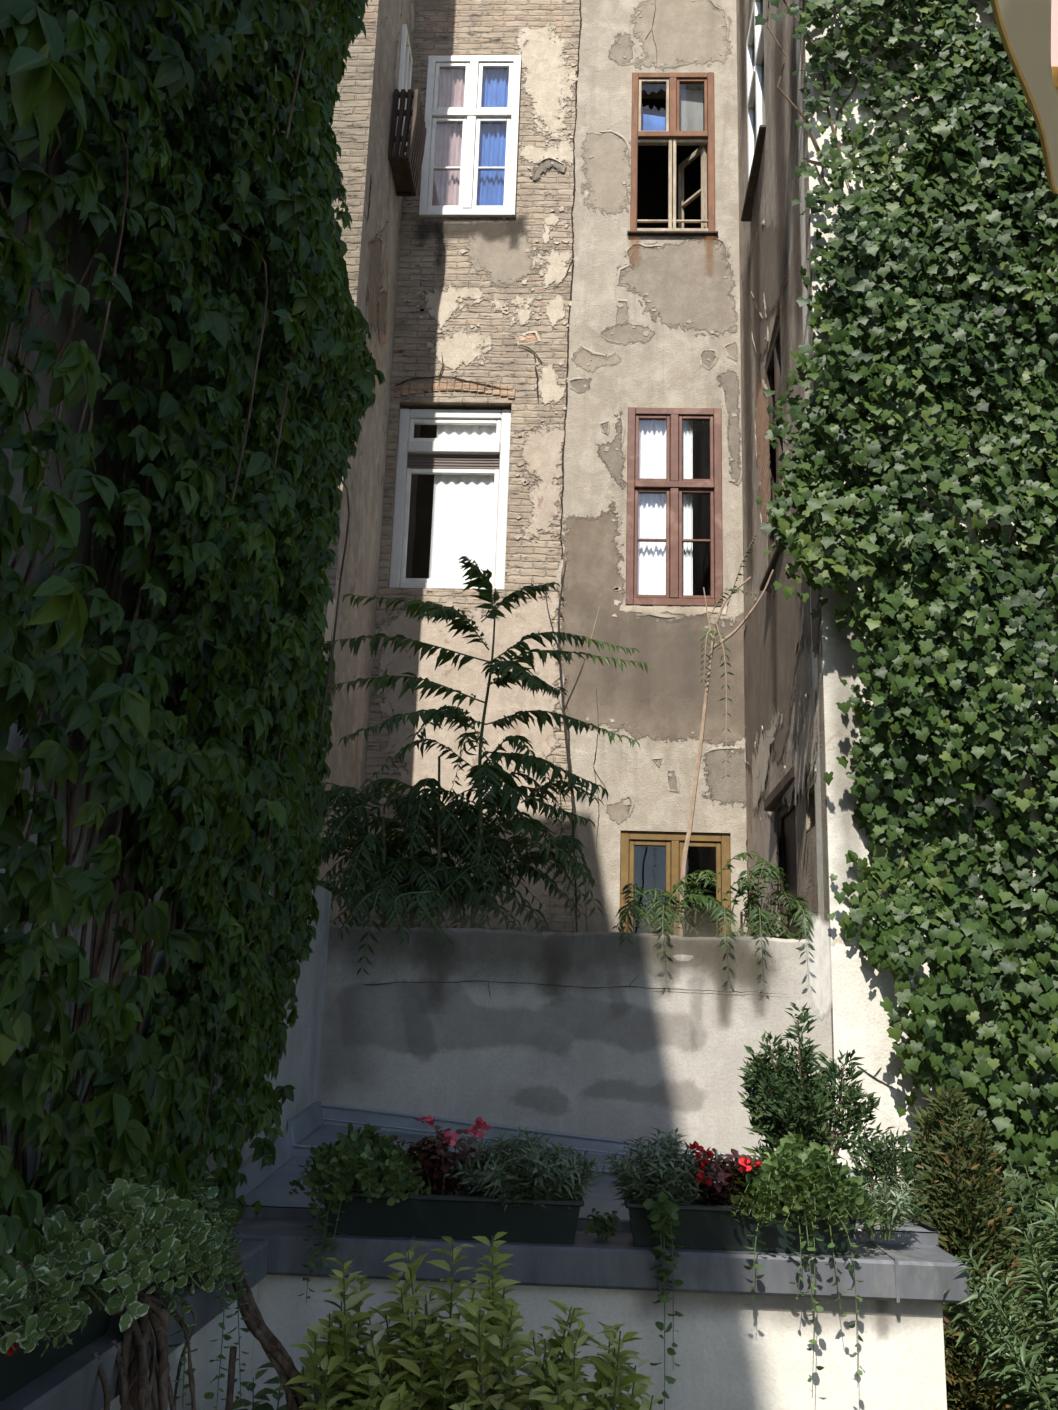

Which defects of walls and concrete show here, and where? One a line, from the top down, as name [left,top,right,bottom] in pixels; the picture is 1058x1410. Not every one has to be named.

flaking render [608,0,733,71]
flaking render [527,131,573,180]
flaking render [559,218,788,524]
flaking render [556,411,821,913]
crack [363,974,806,999]
leakage [720,949,729,1020]